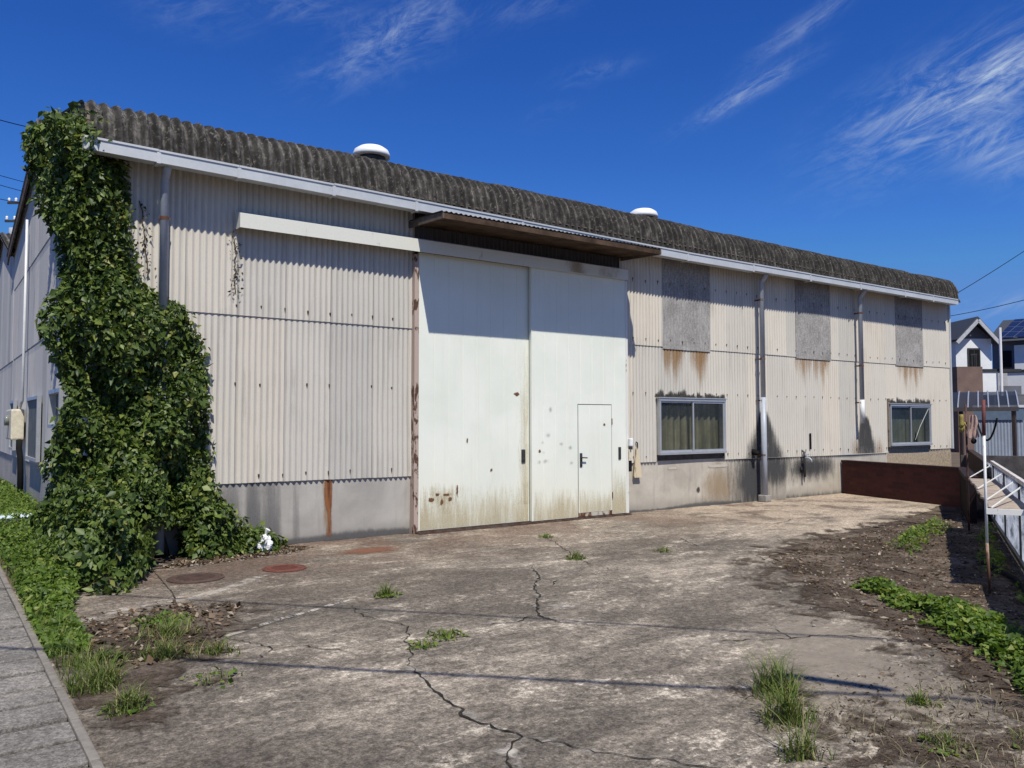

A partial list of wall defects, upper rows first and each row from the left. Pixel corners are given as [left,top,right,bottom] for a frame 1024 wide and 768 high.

corrosion [633,337,707,376]
mould [655,390,725,398]
damp [738,413,831,502]
corrosion [324,471,332,535]
crack [352,605,717,768]